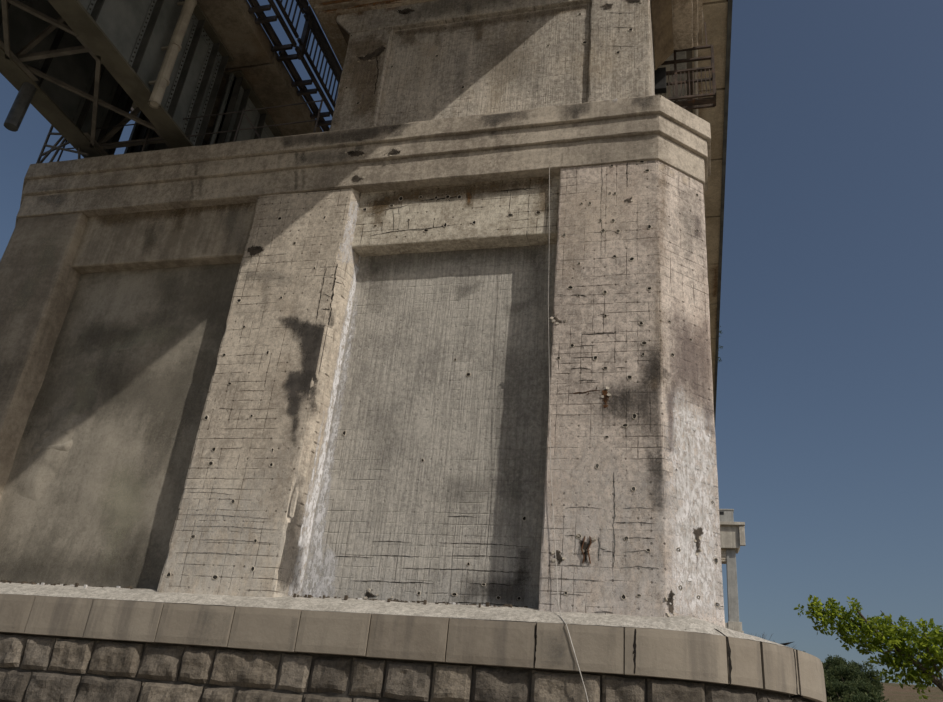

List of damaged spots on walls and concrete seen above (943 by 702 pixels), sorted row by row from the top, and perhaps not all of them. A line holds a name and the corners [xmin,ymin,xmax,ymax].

damp [278,177,547,599]
damp [607,351,672,428]
damp [675,322,707,398]
damp [651,458,662,506]
crack [548,472,697,597]
crack [335,541,528,606]
crack [531,625,539,666]
crack [630,629,638,674]
crack [714,605,732,688]